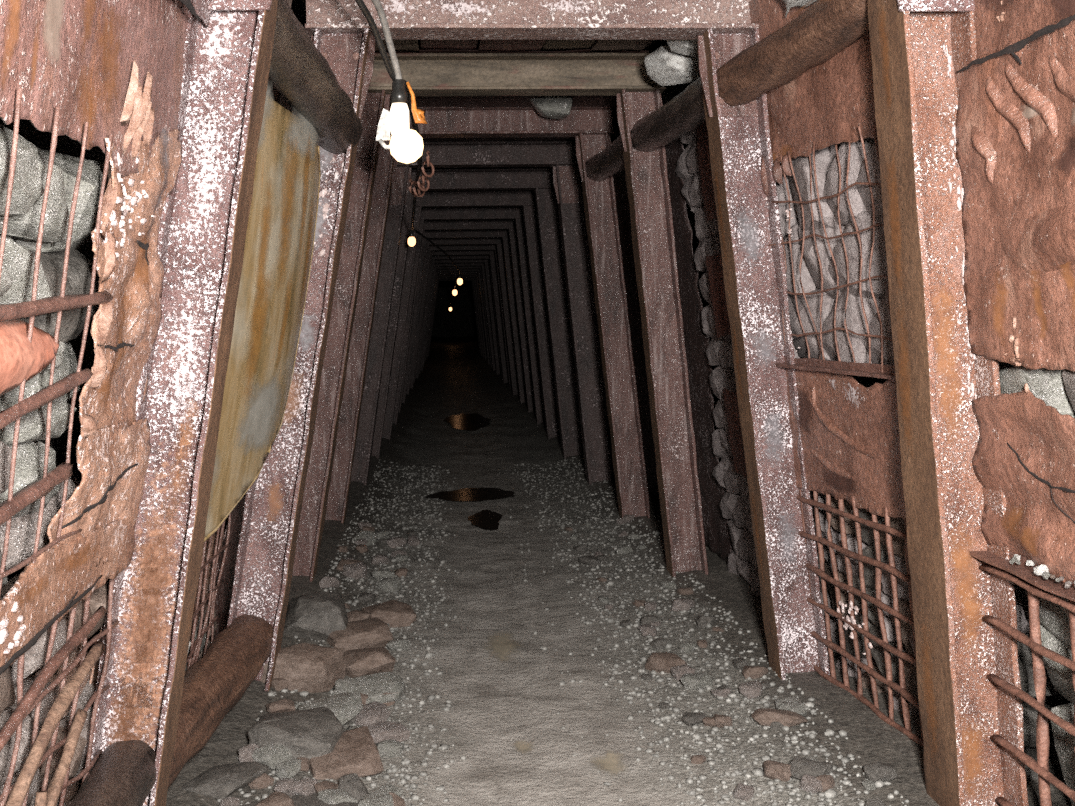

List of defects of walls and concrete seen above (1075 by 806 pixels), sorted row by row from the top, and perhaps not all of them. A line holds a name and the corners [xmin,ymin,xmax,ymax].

crack [956,15,1075,73]
corrosion [0,0,213,283]
corrosion [91,300,126,397]
corrosion [82,414,97,439]
crack [62,463,138,529]
crack [1007,443,1075,524]